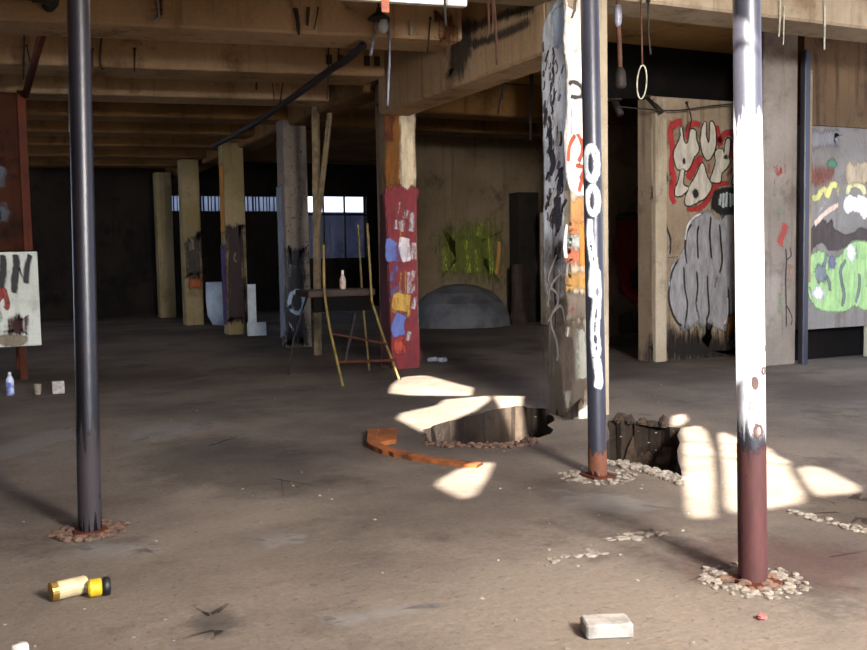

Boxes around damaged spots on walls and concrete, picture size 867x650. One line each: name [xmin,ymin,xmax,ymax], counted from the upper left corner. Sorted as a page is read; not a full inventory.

hole [421,406,554,445]
hole [606,420,682,476]